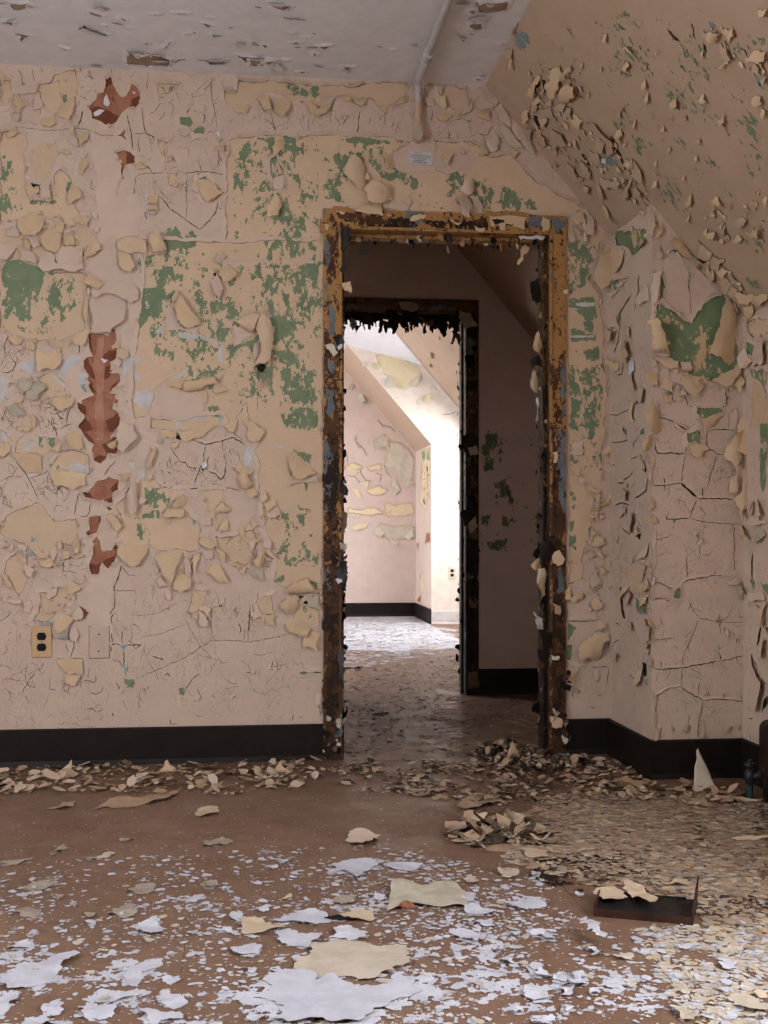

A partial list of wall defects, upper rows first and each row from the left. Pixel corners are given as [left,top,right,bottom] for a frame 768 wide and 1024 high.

crack [10,68,415,229]
crack [0,335,29,373]
peeling [0,0,768,759]
crack [610,245,692,376]
crack [0,406,90,517]
crack [158,434,248,491]
crack [609,386,743,729]
crack [0,564,304,725]